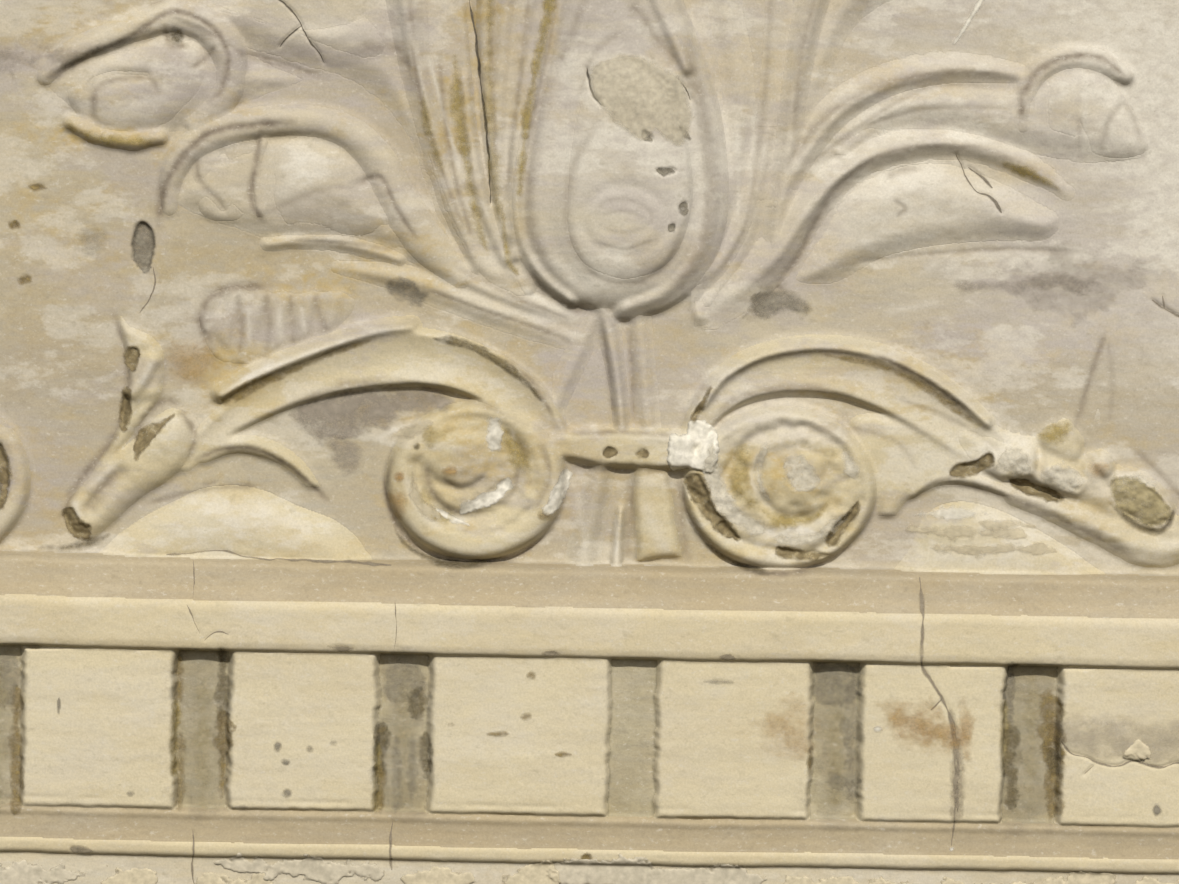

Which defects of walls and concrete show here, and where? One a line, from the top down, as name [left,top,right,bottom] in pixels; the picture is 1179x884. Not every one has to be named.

crack [279,0,324,62]
crack [469,0,491,203]
spalling [124,346,140,371]
spalling [119,387,174,459]
spalling [691,388,711,422]
spalling [0,444,10,509]
spalling [63,507,91,539]
spalling [684,446,764,541]
spalling [776,501,859,560]
spalling [950,449,1082,502]
spalling [1112,476,1171,526]
crack [919,577,959,846]